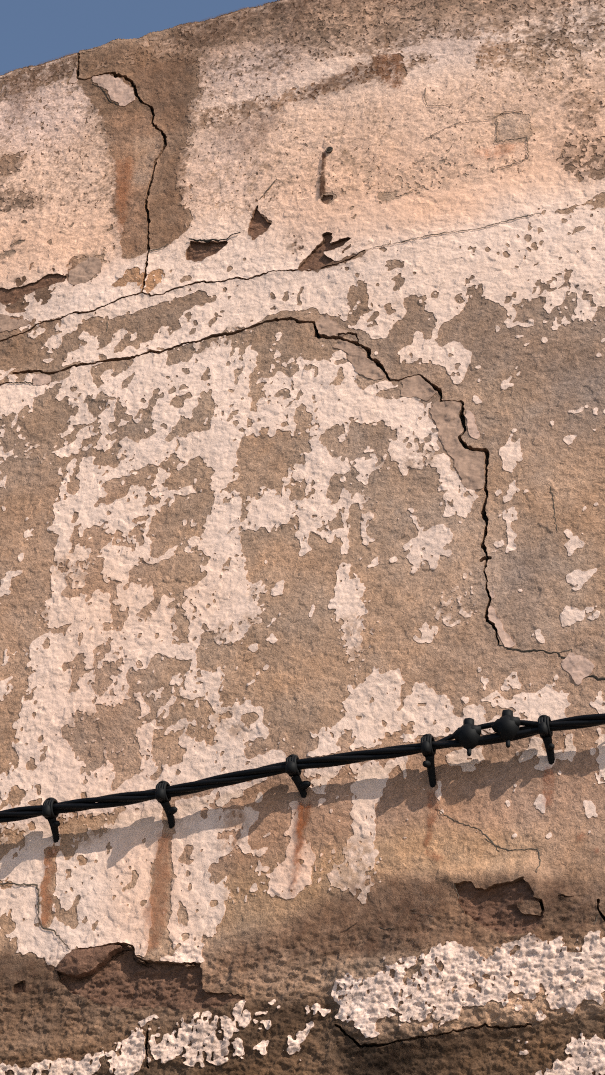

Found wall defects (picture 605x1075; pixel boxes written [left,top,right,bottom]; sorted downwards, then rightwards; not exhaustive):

crack [79,77,167,146]
crack [364,212,543,250]
crack [315,327,391,381]
peeling [0,0,605,814]
crack [433,388,573,659]
rust [294,803,310,880]
crack [435,808,541,873]
peeling [583,800,598,833]
crack [0,882,70,950]
peeling [0,756,408,1075]
peeling [283,880,605,1061]
peeling [535,1033,605,1075]